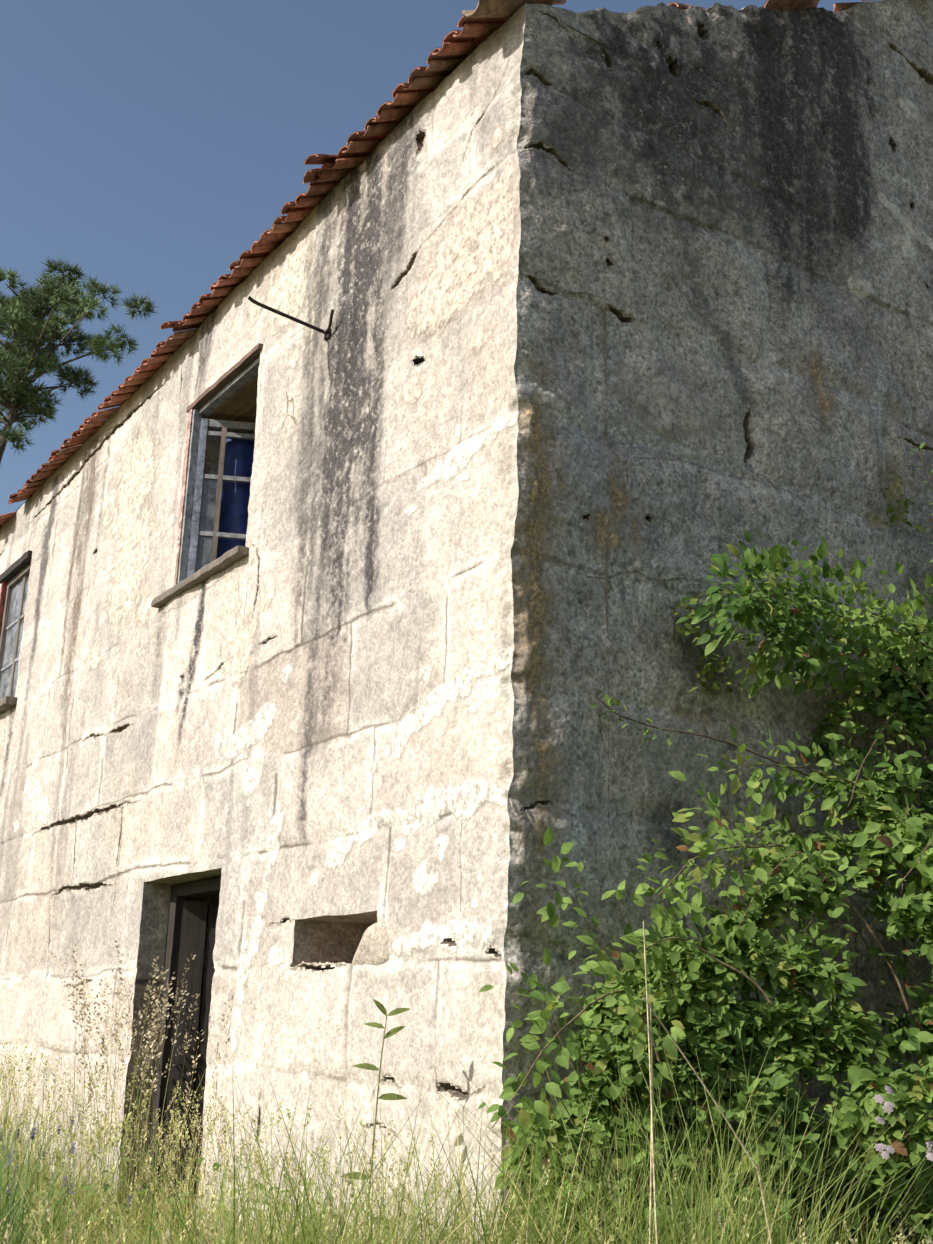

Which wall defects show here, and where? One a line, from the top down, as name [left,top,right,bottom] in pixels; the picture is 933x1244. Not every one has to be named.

crack [375,58,568,329]
crack [520,139,582,178]
water stain [546,5,876,302]
crack [887,41,933,87]
water stain [293,114,417,820]
corrosion [513,398,564,709]